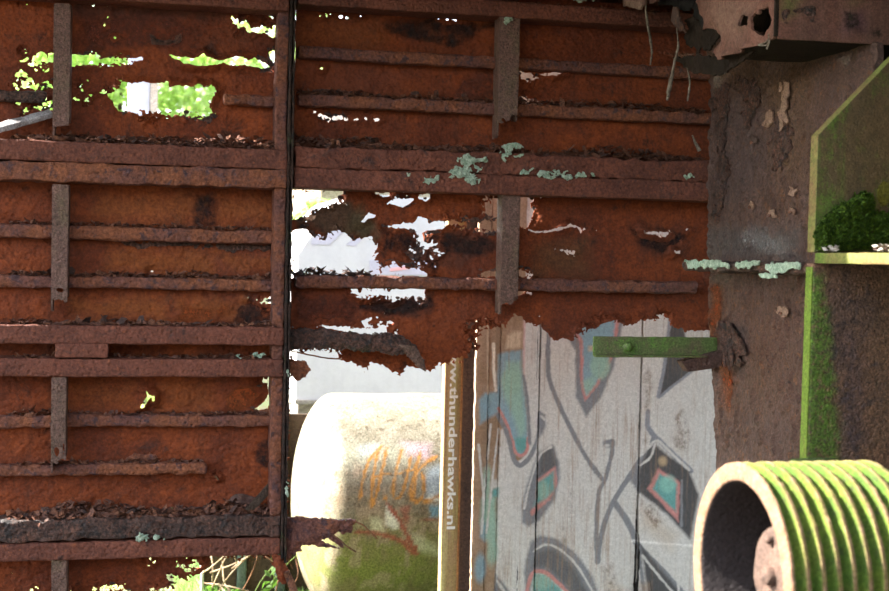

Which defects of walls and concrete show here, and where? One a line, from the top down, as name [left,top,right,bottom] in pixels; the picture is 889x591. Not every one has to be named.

peeling [762,81,790,132]
peeling [767,186,799,218]
peeling [292,209,328,240]
peeling [406,229,438,255]